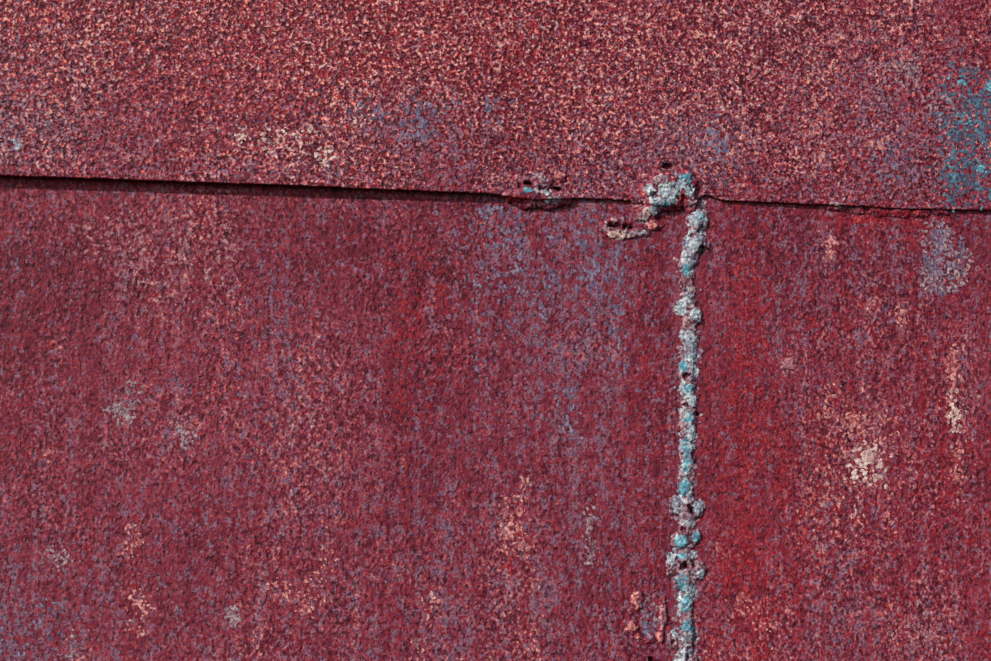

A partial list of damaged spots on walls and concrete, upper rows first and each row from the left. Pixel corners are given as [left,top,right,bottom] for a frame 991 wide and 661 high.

rust [501,173,573,212]
rust [598,215,665,240]
rust [817,210,944,234]
peeling [631,171,708,661]
rust [701,206,843,661]
rust [944,320,991,506]
rust [122,522,144,559]
rust [493,475,540,592]
rust [120,573,161,638]
rust [625,590,669,661]